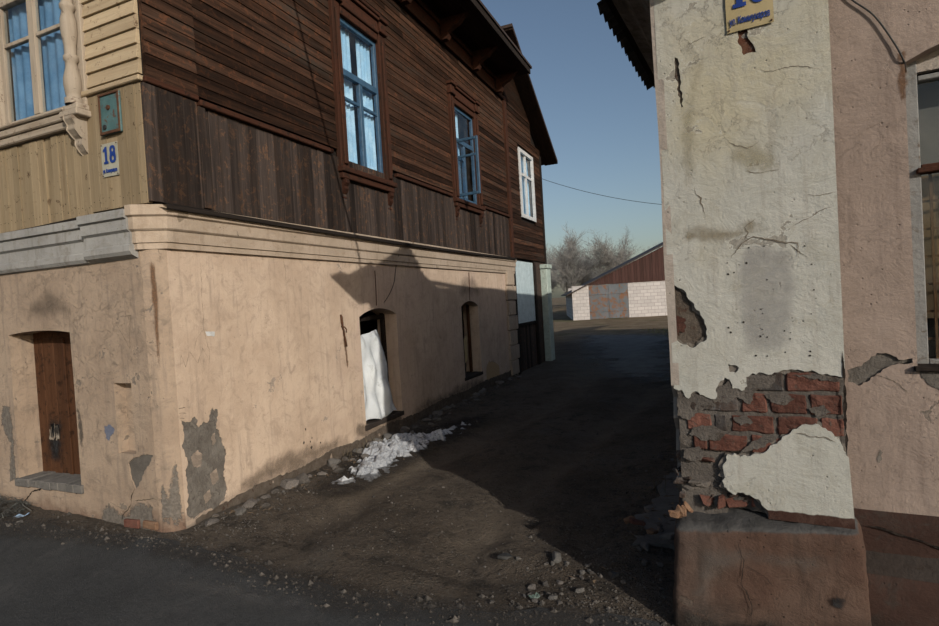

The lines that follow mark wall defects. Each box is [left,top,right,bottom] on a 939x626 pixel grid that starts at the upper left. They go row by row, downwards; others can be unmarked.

crack [731,192,833,257]
spalling [674,286,706,345]
spalling [920,372,939,389]
spalling [129,454,153,488]
peeling [182,370,517,525]
spalling [668,353,918,519]